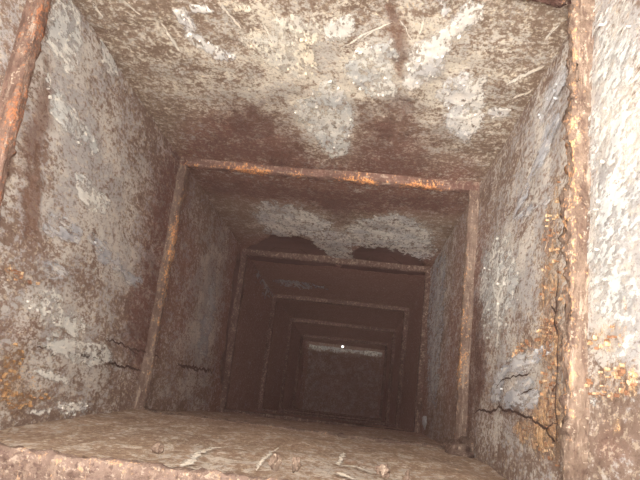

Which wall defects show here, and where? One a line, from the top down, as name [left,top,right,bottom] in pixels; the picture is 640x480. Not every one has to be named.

corrosion [24,65,51,162]
corrosion [23,174,41,236]
crack [37,338,159,371]
crack [179,364,214,374]
crack [473,281,559,454]